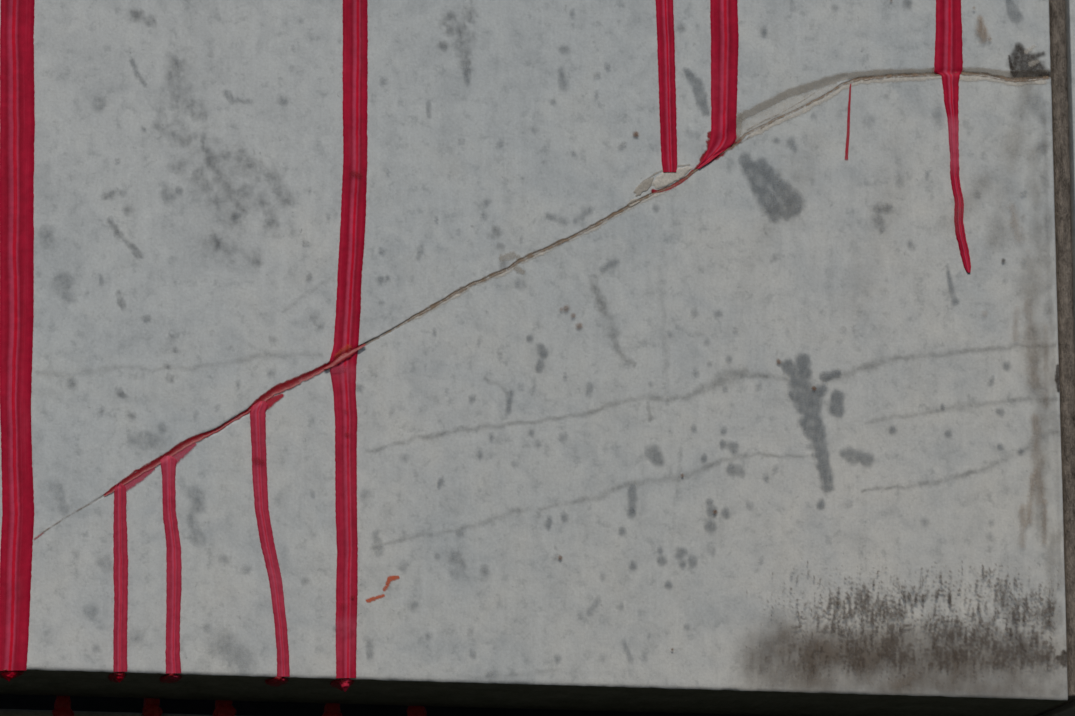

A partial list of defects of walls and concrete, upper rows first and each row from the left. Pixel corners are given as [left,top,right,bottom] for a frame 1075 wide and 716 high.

crack [359,68,1050,346]
mould [752,565,1058,691]